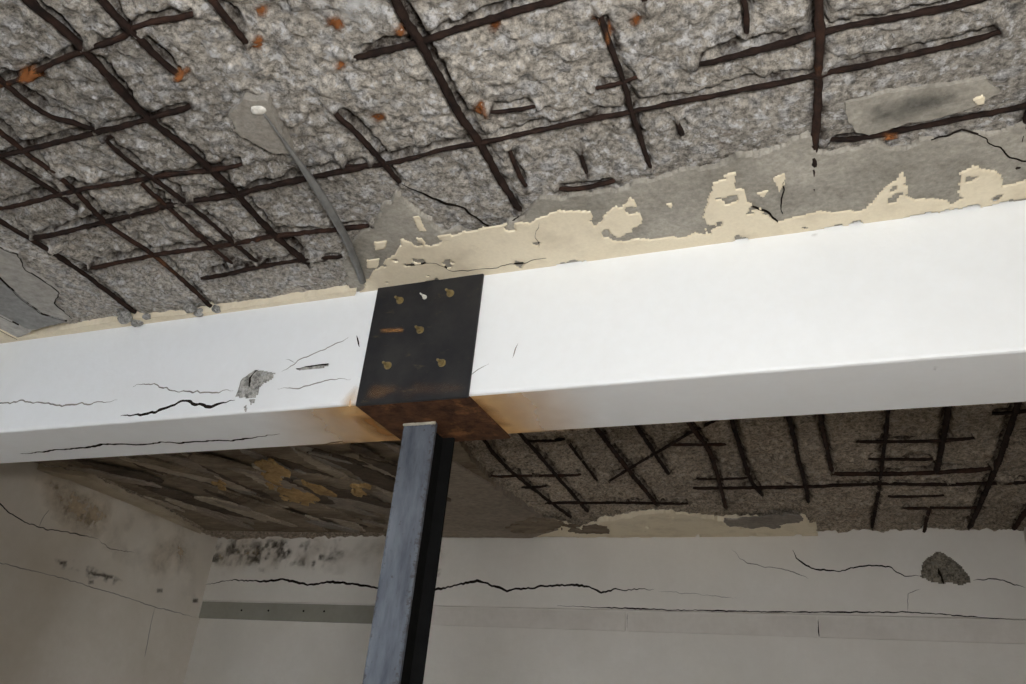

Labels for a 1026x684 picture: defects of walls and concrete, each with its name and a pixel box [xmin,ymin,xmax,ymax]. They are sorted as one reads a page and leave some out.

corrosion [328,18,343,30]
corrosion [474,101,486,118]
spalling [0,0,1026,344]
crack [0,383,234,416]
corrosion [470,393,538,434]
crack [22,434,277,454]
spalling [442,402,1026,538]
peeling [33,440,401,540]
leakage [213,540,289,563]
crack [206,578,378,589]
crack [435,551,1013,635]
spalling [920,552,971,585]